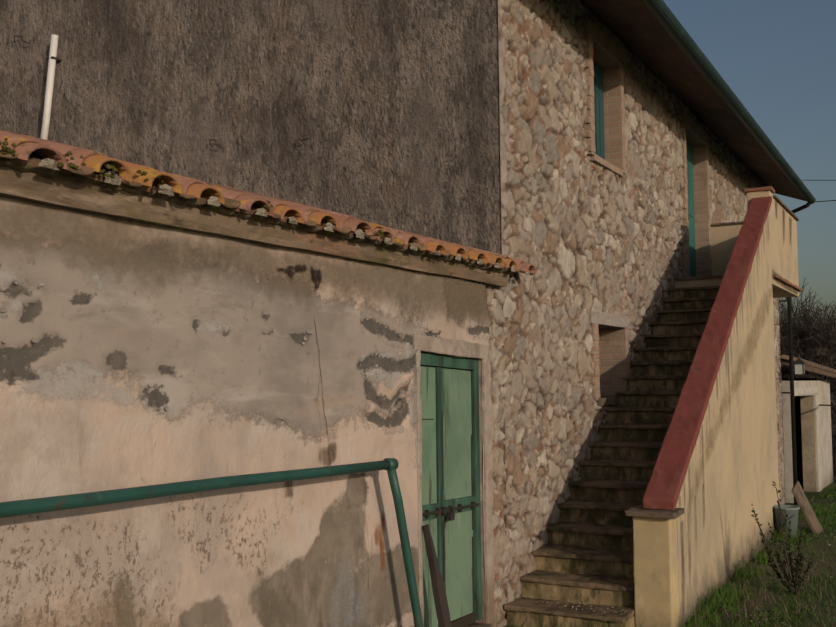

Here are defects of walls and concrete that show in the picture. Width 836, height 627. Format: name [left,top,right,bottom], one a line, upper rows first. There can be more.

peeling [0,236,441,442]
peeling [467,325,490,339]
leakage [251,472,419,627]
corrosion [376,515,385,568]
leakage [181,597,230,627]